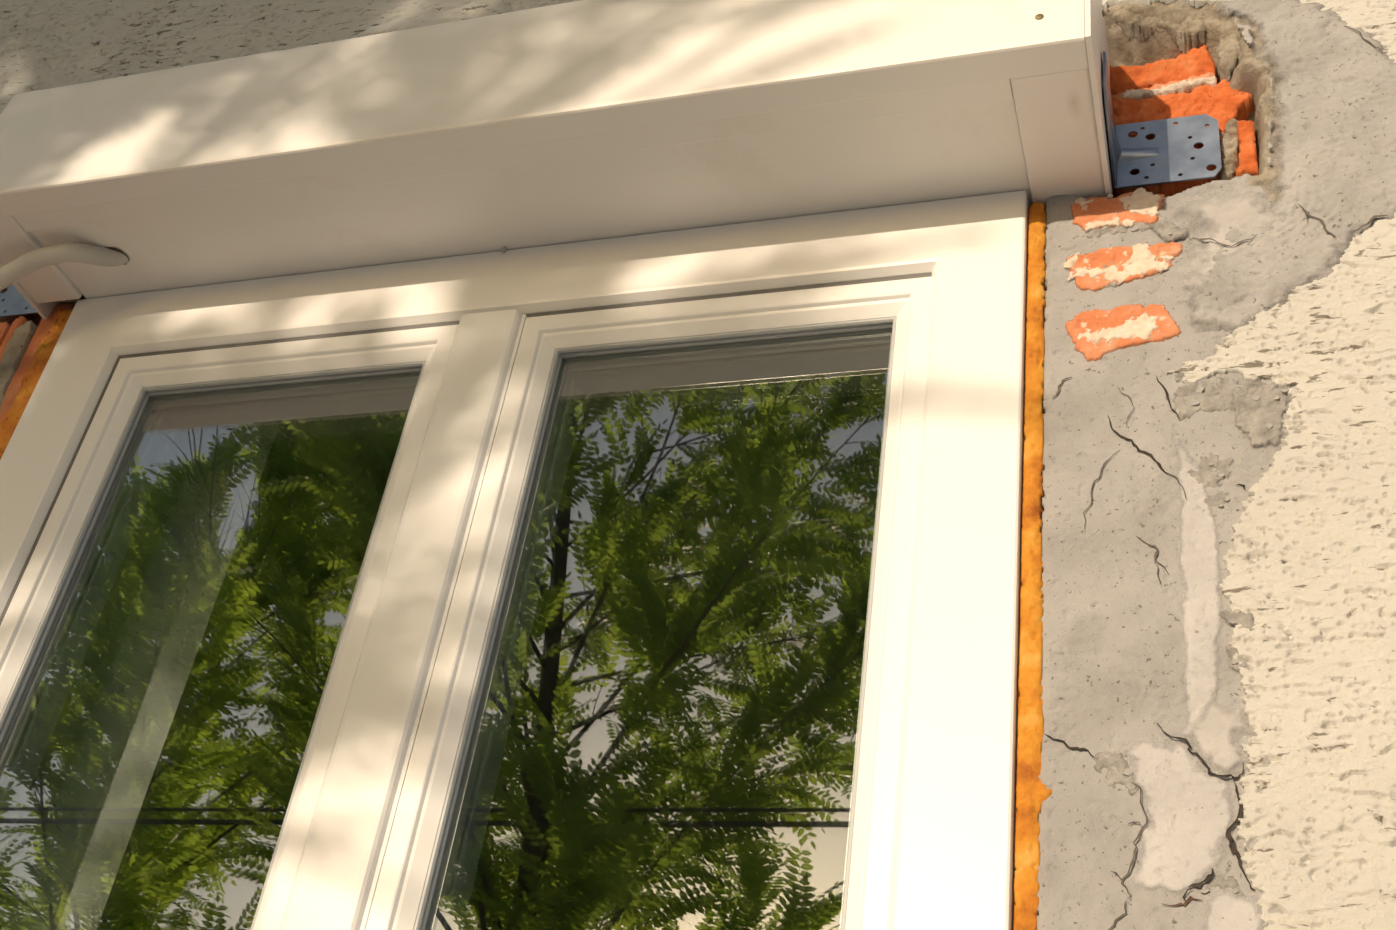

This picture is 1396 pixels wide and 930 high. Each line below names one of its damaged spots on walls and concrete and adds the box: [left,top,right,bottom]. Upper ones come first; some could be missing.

spalling [1063,0,1284,291]
flaking render [0,294,86,422]
flaking render [1065,304,1182,361]
spalling [1173,373,1246,421]
crack [1083,376,1186,529]
spalling [1187,452,1235,517]
crack [1136,536,1169,583]
spalling [1219,609,1256,631]
crack [1045,734,1094,757]
peeling [1192,702,1249,770]
crack [1157,723,1255,906]
crack [1109,782,1148,930]